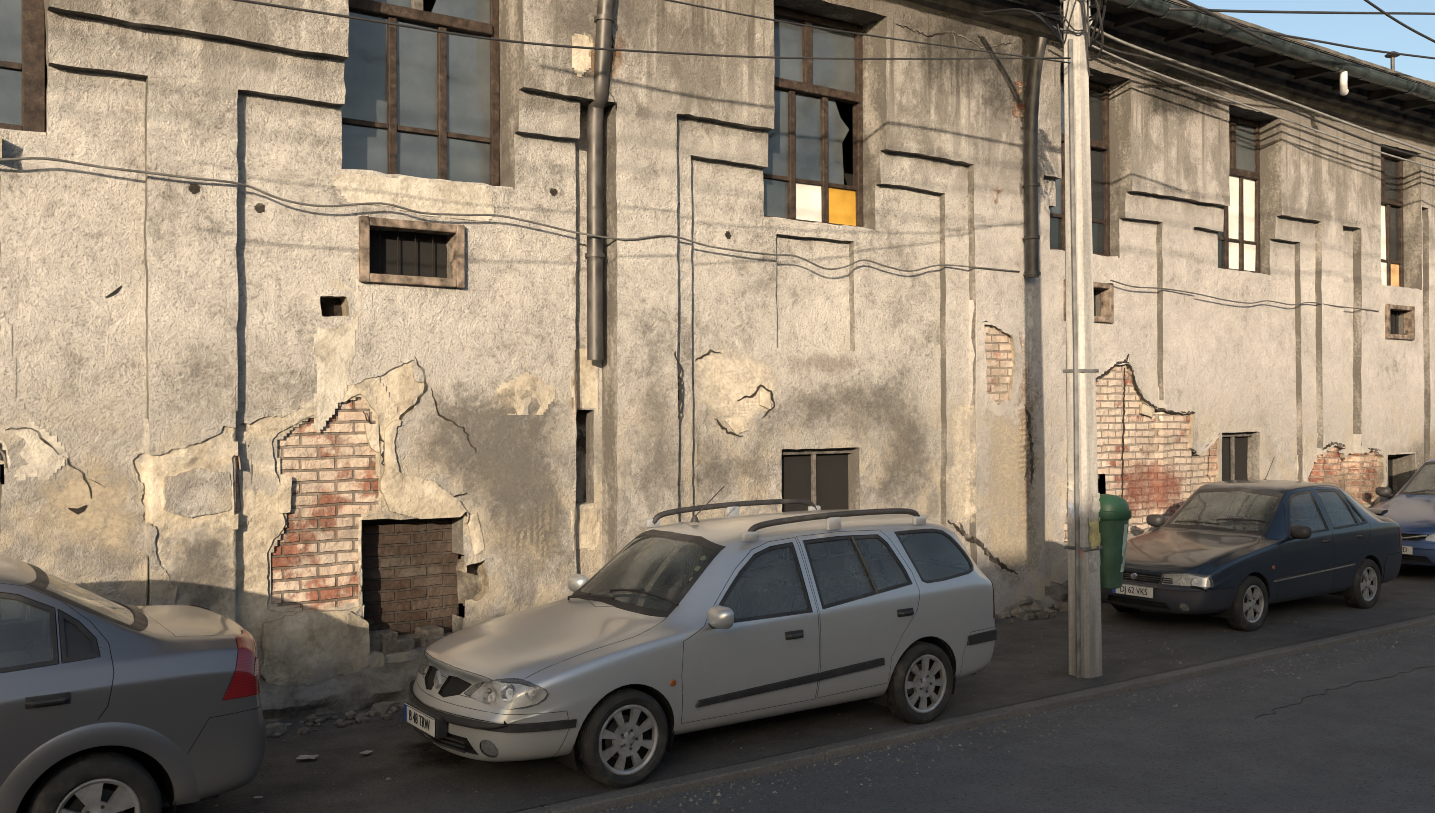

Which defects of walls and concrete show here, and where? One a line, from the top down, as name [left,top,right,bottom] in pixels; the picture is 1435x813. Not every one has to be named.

peeling [572,33,593,77]
crack [674,351,682,420]
peeling [695,349,776,437]
crack [63,456,101,514]
spalling [0,269,459,677]
spalling [949,298,1068,577]
spalling [1095,342,1228,539]
spalling [1291,422,1390,508]
crack [947,520,1018,575]